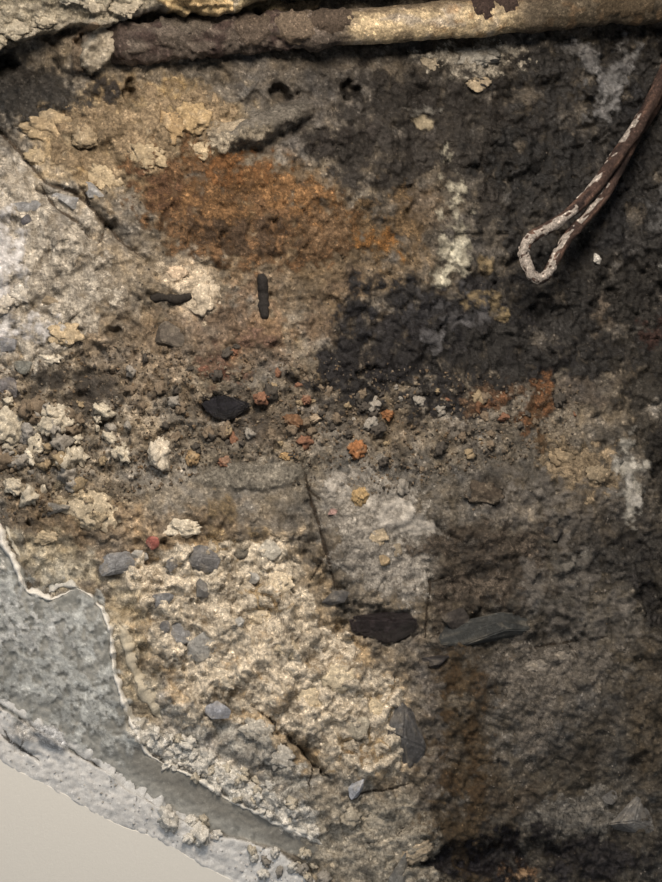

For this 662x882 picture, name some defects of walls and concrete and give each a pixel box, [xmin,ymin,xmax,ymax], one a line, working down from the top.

spalling [0,0,322,74]
spalling [407,37,538,93]
spalling [0,80,245,398]
rust [117,132,423,276]
peeling [517,173,610,284]
leakage [284,23,662,671]
spalling [48,480,122,534]
spalling [317,453,448,615]
spalling [535,433,621,505]
spalling [0,523,443,882]
spalling [480,626,630,779]
spalling [520,783,654,846]